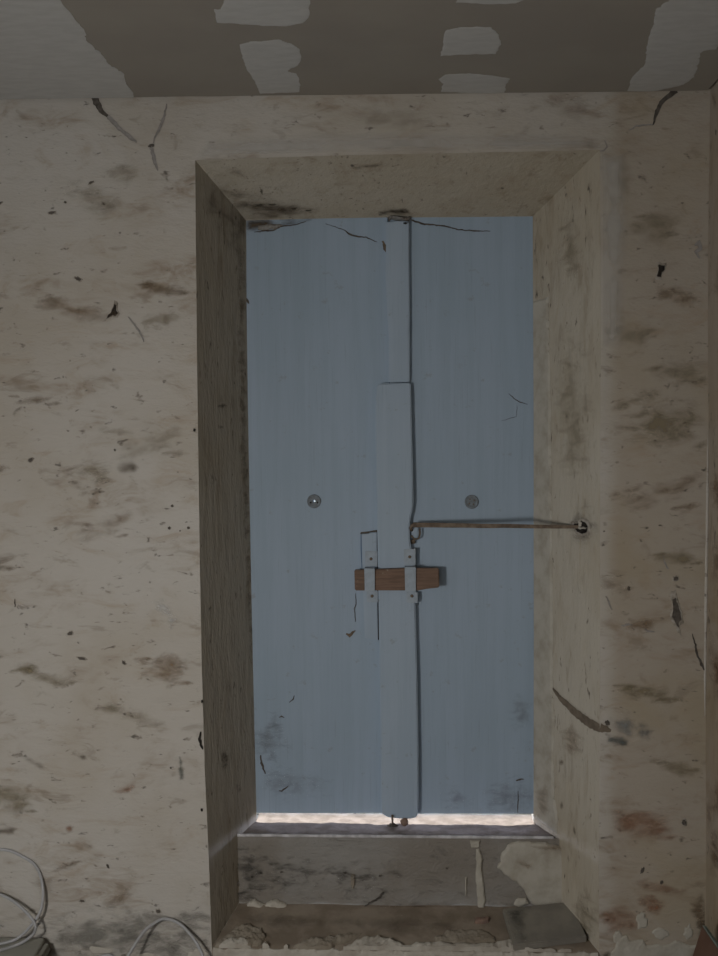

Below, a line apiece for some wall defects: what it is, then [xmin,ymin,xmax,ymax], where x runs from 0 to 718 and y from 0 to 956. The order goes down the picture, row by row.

crack [629,91,678,130]
crack [91,98,167,171]
crack [256,221,376,242]
crack [411,219,487,232]
peeling [497,841,562,907]
spalling [213,912,704,956]